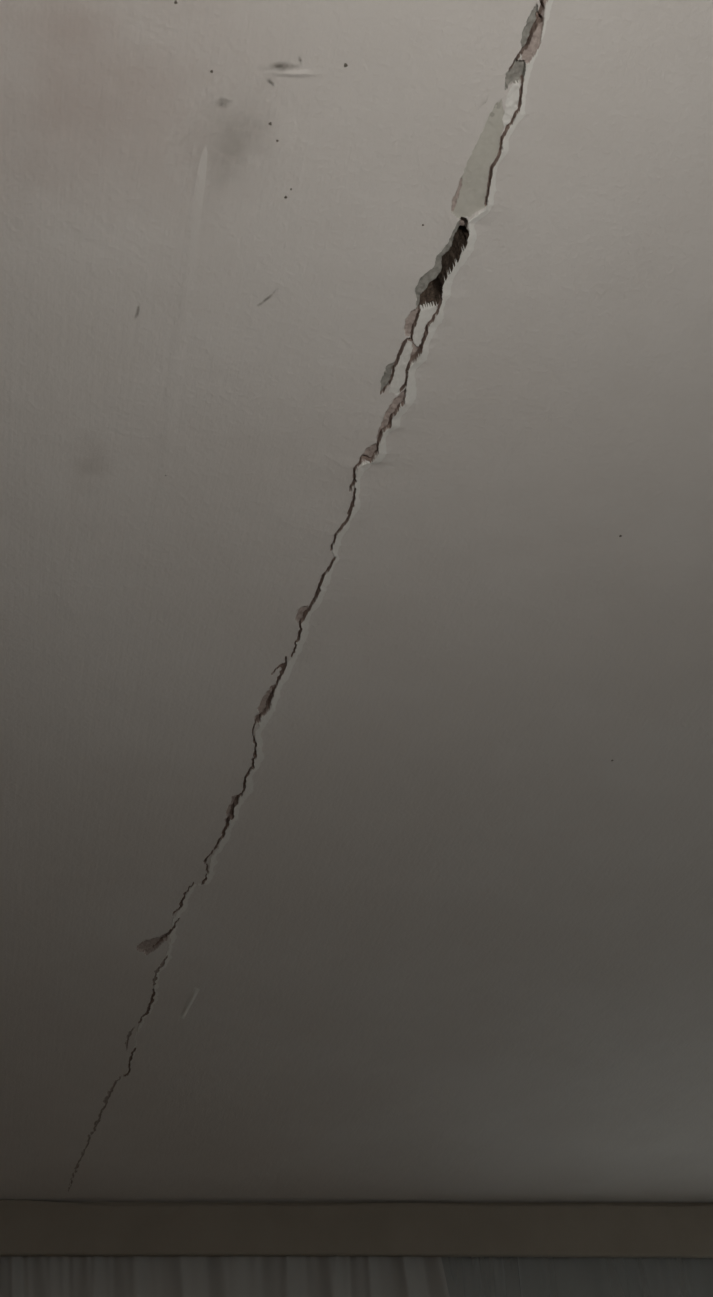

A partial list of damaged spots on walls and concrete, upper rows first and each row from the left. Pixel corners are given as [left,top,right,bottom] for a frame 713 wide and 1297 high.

flaking render [505,0,548,90]
flaking render [362,217,469,462]
crack [68,0,554,1191]